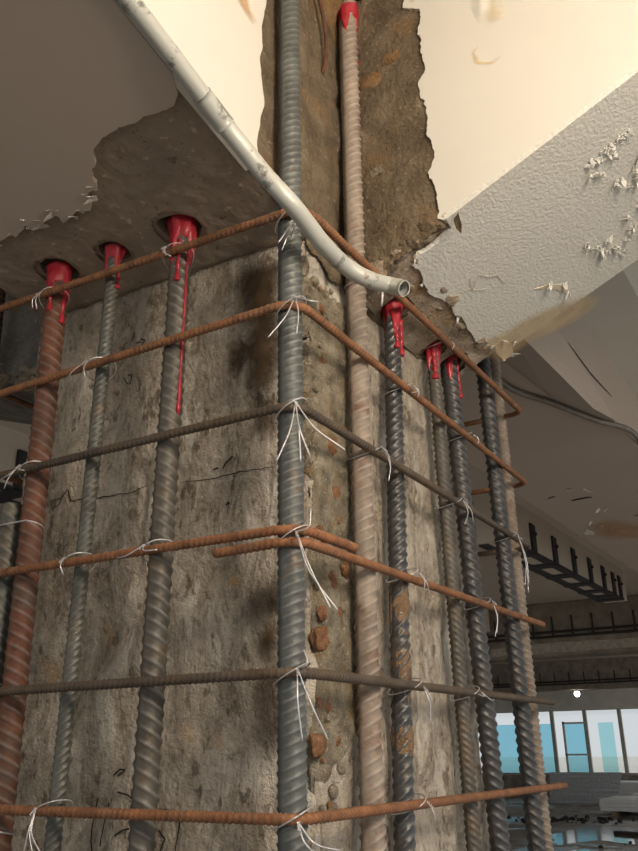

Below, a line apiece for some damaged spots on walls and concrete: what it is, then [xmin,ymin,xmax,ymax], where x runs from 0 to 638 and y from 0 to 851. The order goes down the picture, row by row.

peeling [585,129,638,188]
peeling [585,215,637,261]
crack [568,342,610,394]
spalling [0,0,547,794]
crack [49,486,145,510]
crack [179,467,270,483]
spalling [0,815,15,851]
spalling [43,816,65,851]
spalling [276,824,321,851]
spalling [359,810,416,851]
spalling [463,798,511,851]
spalling [522,791,554,851]